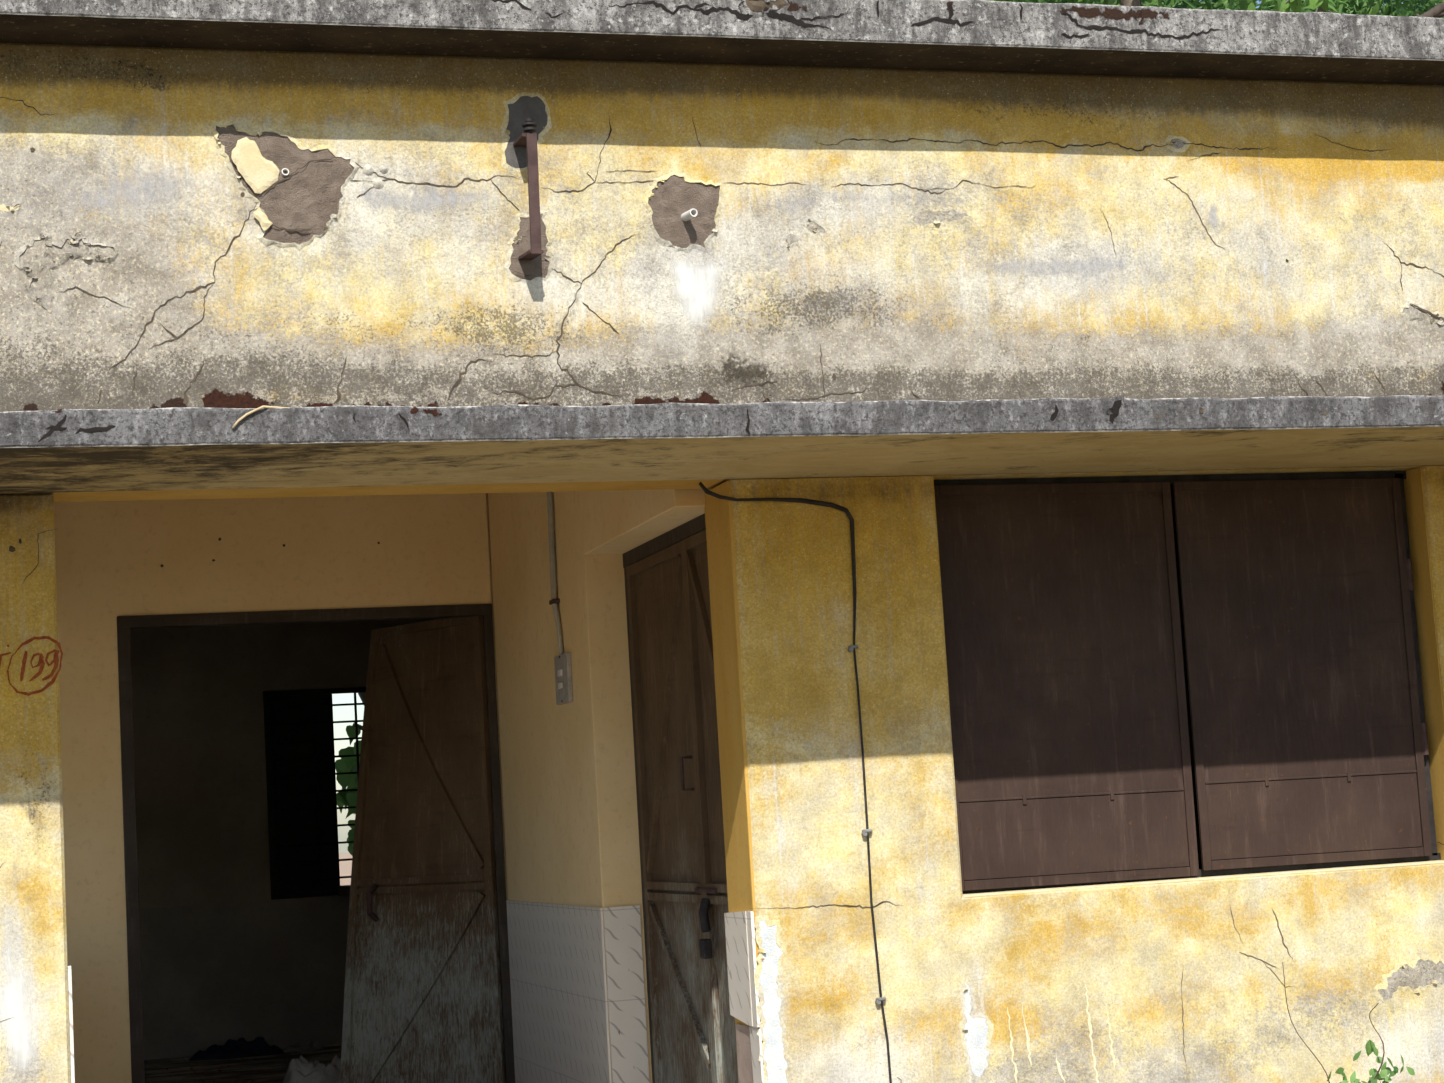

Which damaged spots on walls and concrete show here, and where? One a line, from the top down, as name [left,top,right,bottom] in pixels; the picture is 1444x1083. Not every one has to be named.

flaking render [213,121,360,251]
crack [350,113,654,211]
flaking render [643,171,725,253]
crack [813,138,1283,248]
crack [38,206,256,442]
crack [447,234,639,401]
rust [202,388,276,408]
rust [353,401,442,416]
rust [633,391,720,405]
peeling [754,914,793,1083]
peeling [958,977,995,1081]
peeling [1373,955,1444,1004]